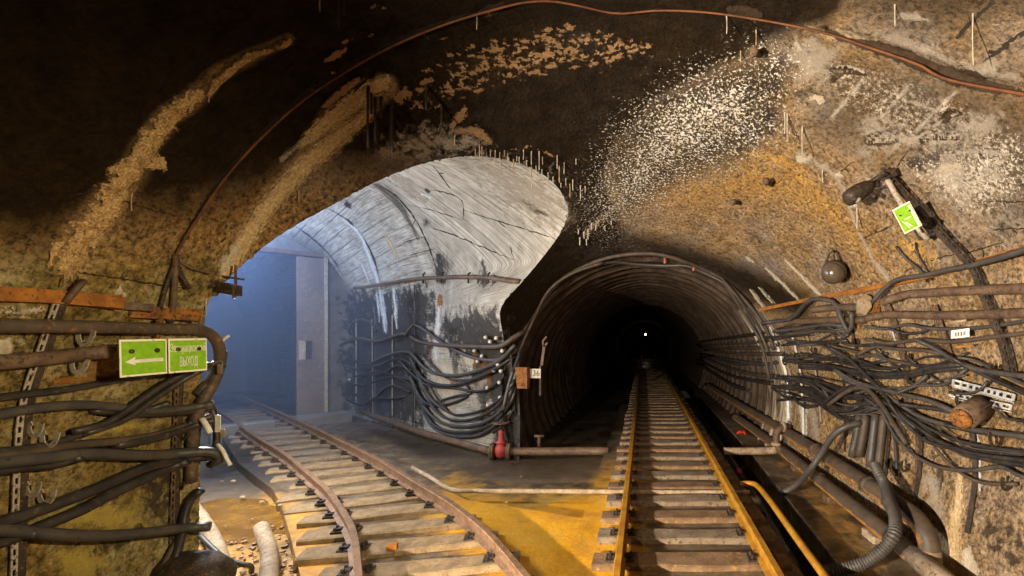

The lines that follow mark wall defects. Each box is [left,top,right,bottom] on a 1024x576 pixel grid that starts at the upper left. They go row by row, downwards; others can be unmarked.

damp [898,11,928,21]
peeling [324,38,353,75]
peeling [378,22,653,169]
damp [887,32,954,62]
damp [966,59,1018,79]
damp [567,27,941,289]
damp [368,183,429,240]
crack [380,166,552,270]
damp [333,199,532,469]